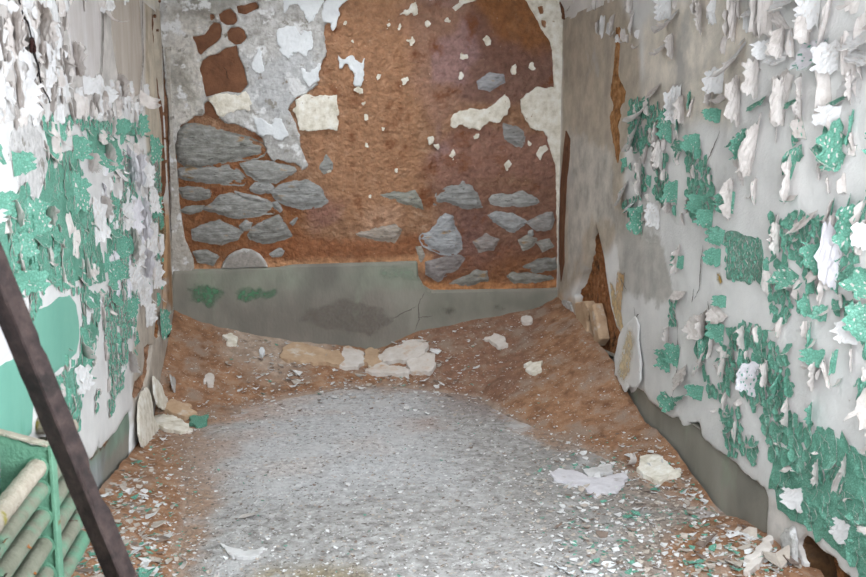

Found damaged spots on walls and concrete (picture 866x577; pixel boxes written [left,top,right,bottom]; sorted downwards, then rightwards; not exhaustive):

peeling [0,0,176,448]
spalling [581,232,642,392]
peeling [591,0,640,49]
peeling [614,0,866,577]